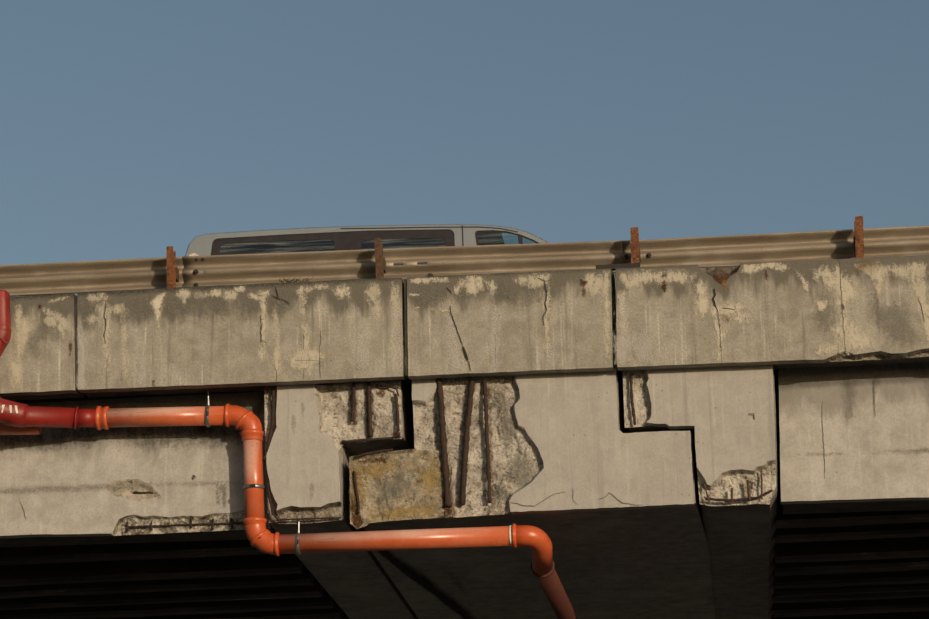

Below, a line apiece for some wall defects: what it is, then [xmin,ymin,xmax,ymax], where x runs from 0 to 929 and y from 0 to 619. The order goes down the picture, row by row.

damp [9,305,35,389]
damp [150,284,350,376]
damp [365,276,497,370]
crack [446,287,471,371]
damp [515,274,552,353]
damp [584,269,750,361]
damp [741,262,787,274]
damp [796,262,929,356]
spalling [106,479,162,502]
spalling [112,509,245,536]
spalling [264,375,544,529]
spalling [697,459,776,506]